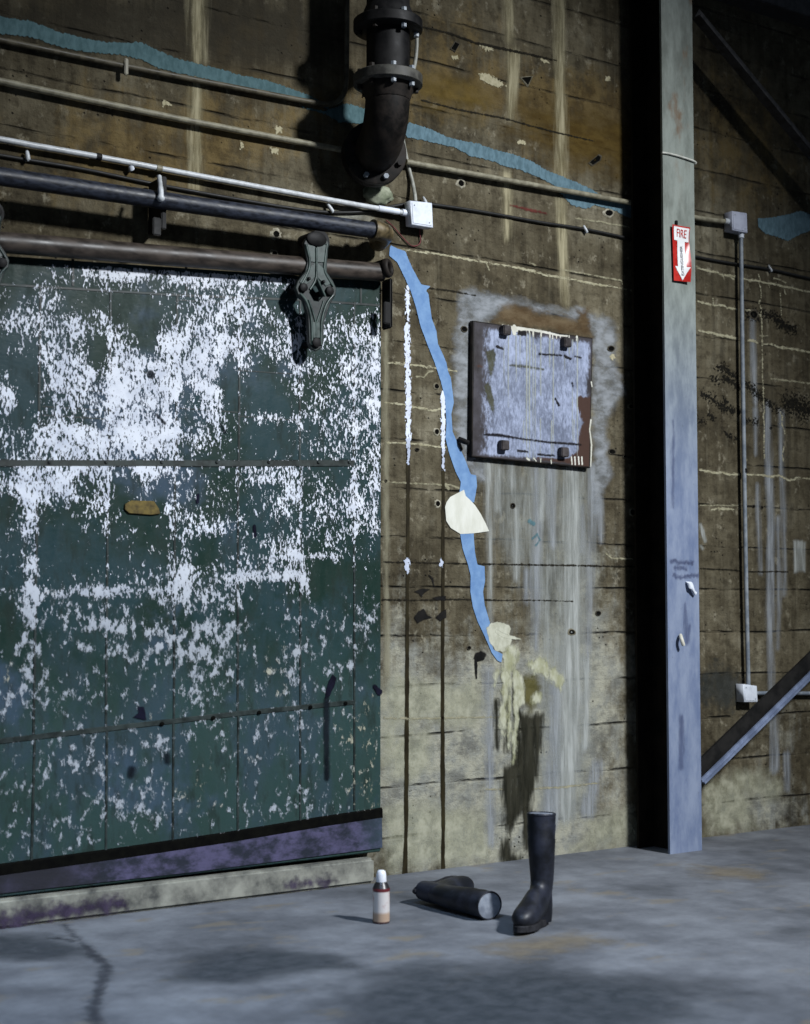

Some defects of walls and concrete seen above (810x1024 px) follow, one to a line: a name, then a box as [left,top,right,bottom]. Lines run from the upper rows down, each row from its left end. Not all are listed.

rust [499,305,592,337]
peeling [0,262,381,765]
water stain [487,464,594,862]
peeling [39,731,190,854]
peeling [213,776,326,827]
crack [57,929,111,1021]